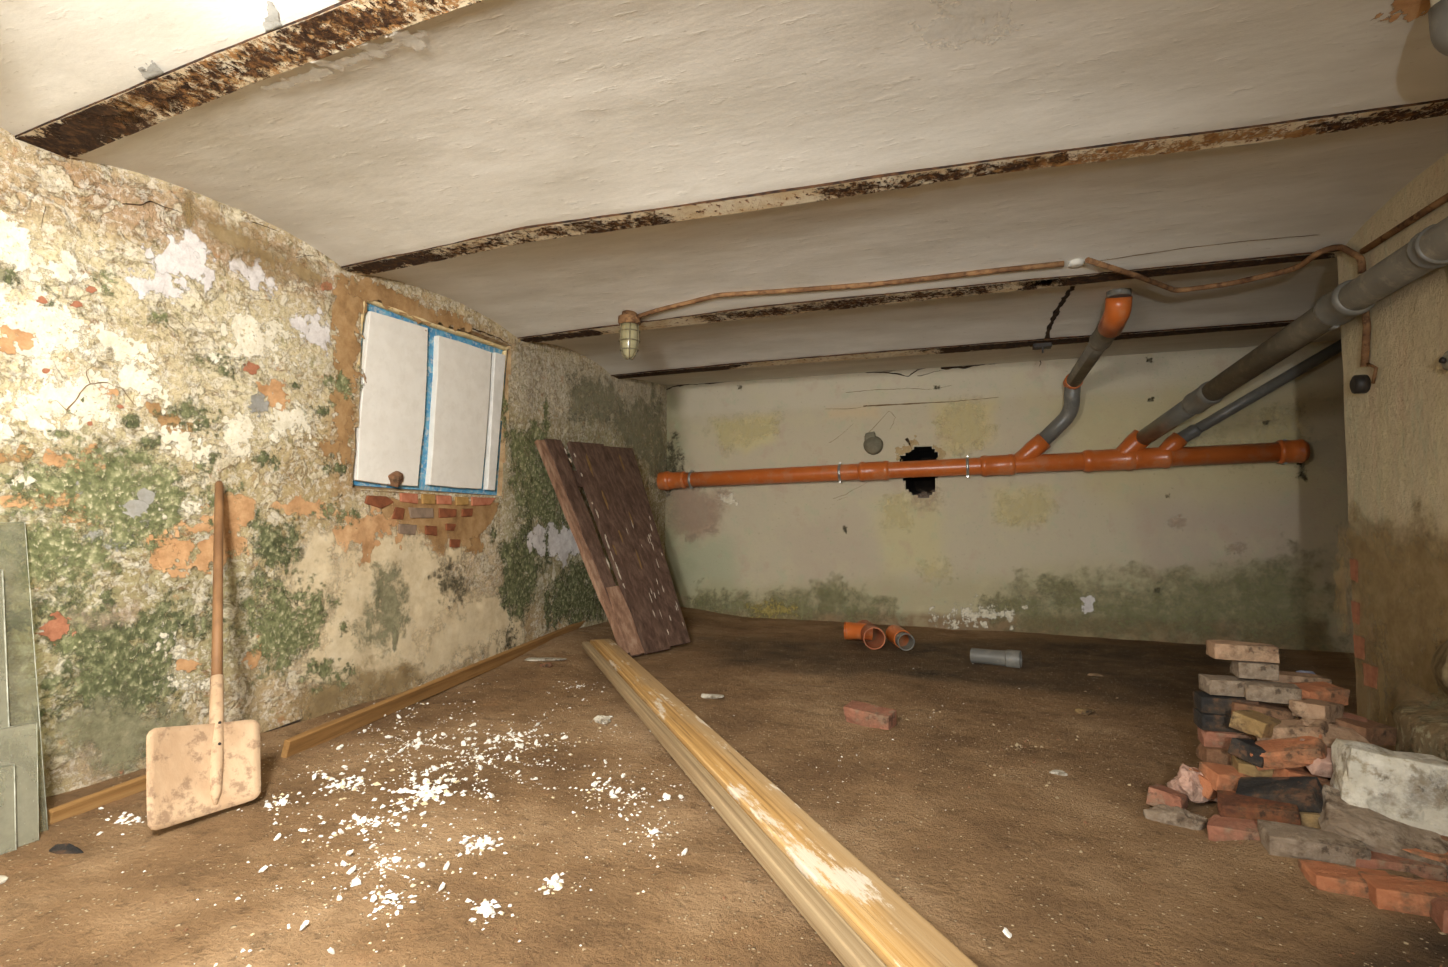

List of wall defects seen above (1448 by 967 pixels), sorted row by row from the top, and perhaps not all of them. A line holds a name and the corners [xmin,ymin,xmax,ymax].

corrosion [15,0,481,159]
corrosion [812,102,1448,202]
corrosion [342,210,677,275]
flaking render [0,209,527,705]
water stain [251,448,281,471]
water stain [322,453,347,476]
spalling [895,435,946,498]
water stain [428,558,467,609]
water stain [928,594,1028,630]
water stain [1080,595,1095,614]
water stain [1334,503,1448,725]
water stain [301,628,421,721]